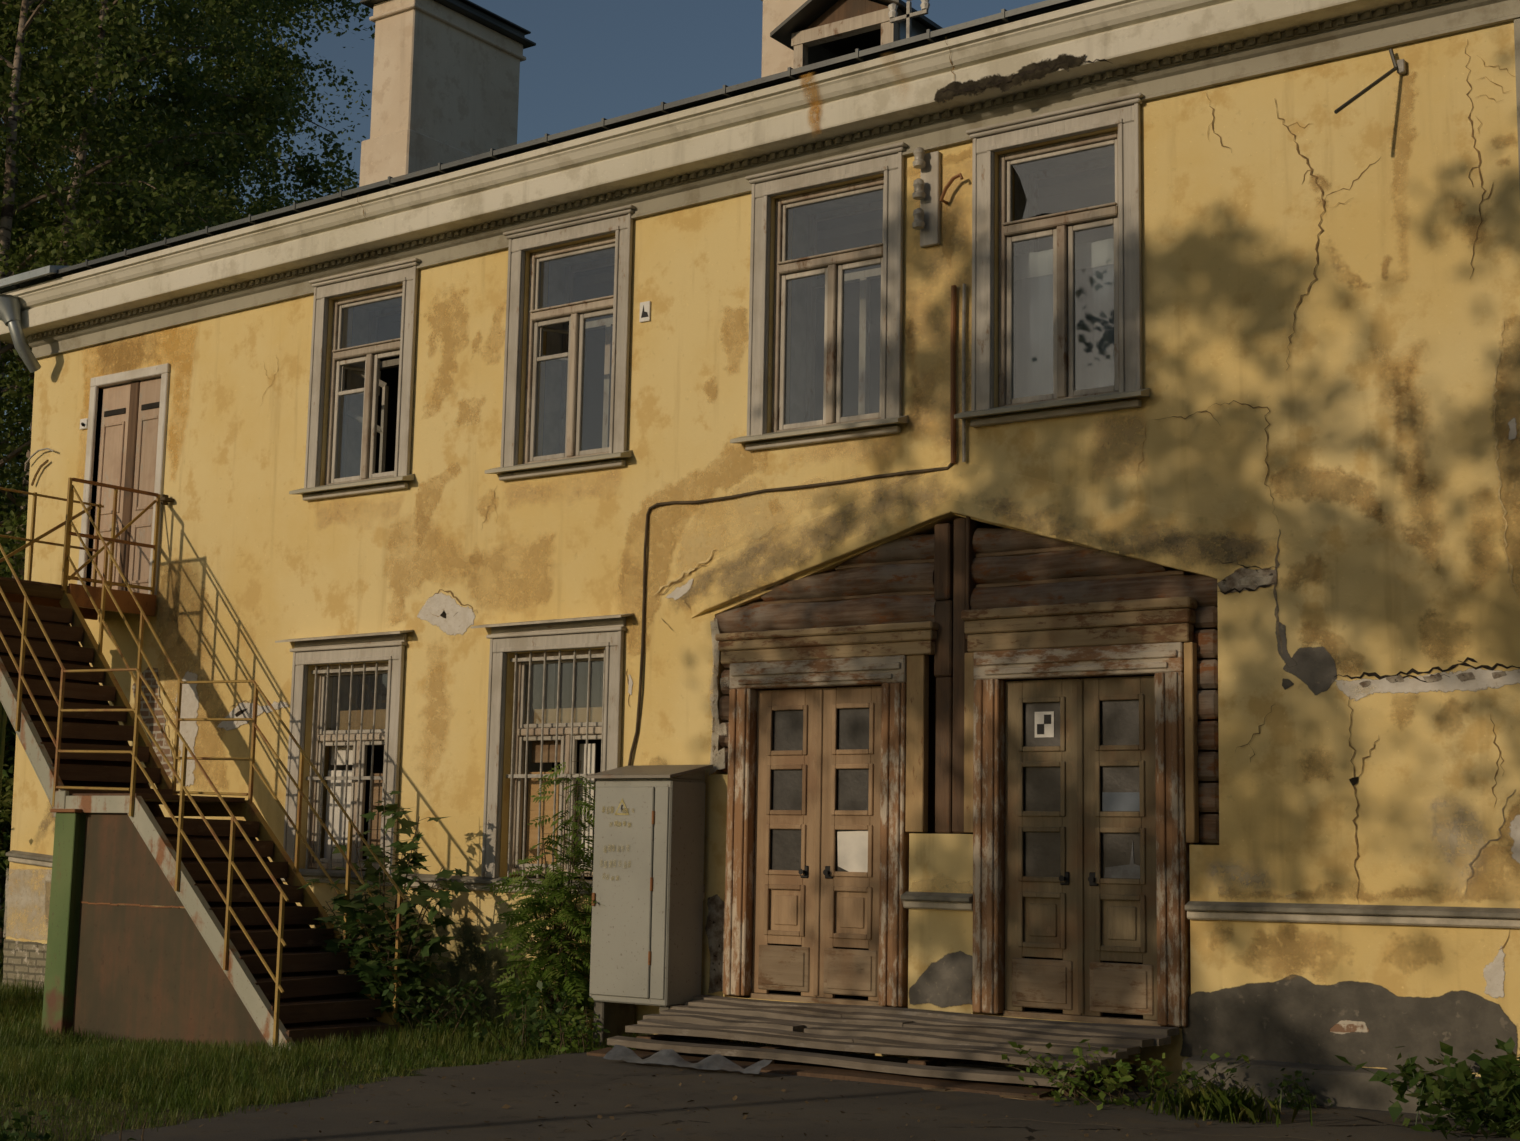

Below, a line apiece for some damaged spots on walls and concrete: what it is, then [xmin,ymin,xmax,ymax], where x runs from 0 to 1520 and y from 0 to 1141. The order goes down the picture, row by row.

crack [1458,39,1515,278]
crack [1275,101,1381,369]
flaking render [1216,559,1277,594]
flaking render [417,589,478,636]
flaking render [1335,657,1520,701]
flaking render [217,700,288,730]
crack [1348,697,1379,902]